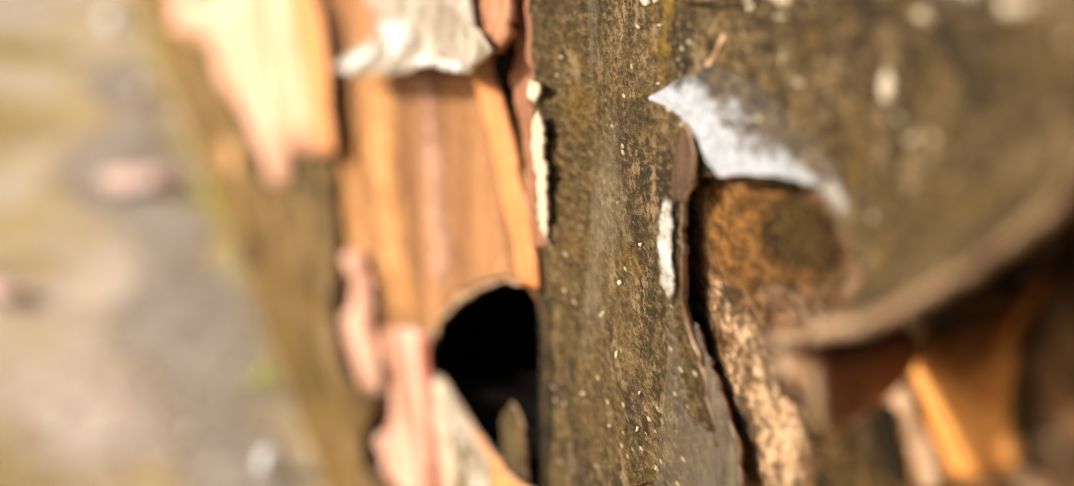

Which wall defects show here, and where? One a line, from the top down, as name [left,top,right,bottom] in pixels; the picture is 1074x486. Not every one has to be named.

peeling [774,0,791,19]
peeling [1000,0,1029,16]
spalling [168,0,605,486]
peeling [602,36,1074,486]